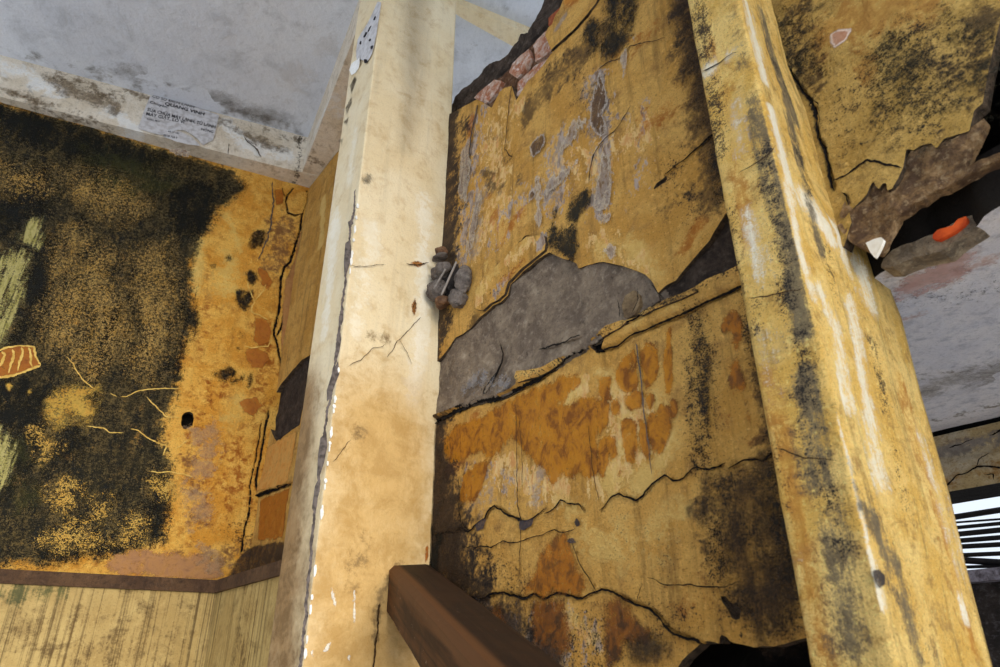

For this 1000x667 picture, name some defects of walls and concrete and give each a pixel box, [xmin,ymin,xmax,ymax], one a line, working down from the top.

spalling [452,0,600,113]
damp [775,4,831,89]
damp [859,4,1000,158]
damp [0,103,302,579]
crack [240,411,290,552]
crack [258,182,308,363]
spalling [298,189,359,667]
rust [444,327,678,503]
spalling [436,154,737,421]
crack [435,285,836,644]
damp [678,290,799,641]
spalling [837,119,1000,277]